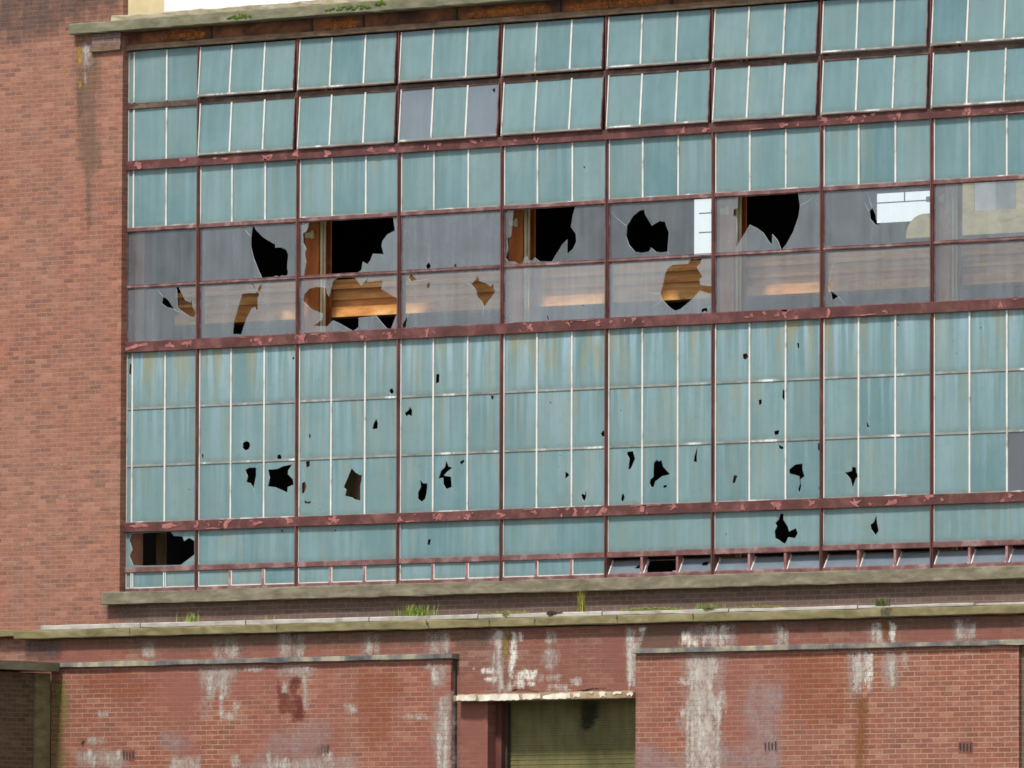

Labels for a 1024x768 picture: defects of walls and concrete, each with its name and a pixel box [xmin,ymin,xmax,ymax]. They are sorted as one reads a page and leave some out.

peeling [295,333,328,344]
peeling [744,309,799,319]
peeling [194,519,233,529]
peeling [557,507,607,517]
damp [200,635,258,719]
damp [280,634,311,702]
damp [477,631,579,692]
damp [627,625,734,768]
damp [848,623,906,692]